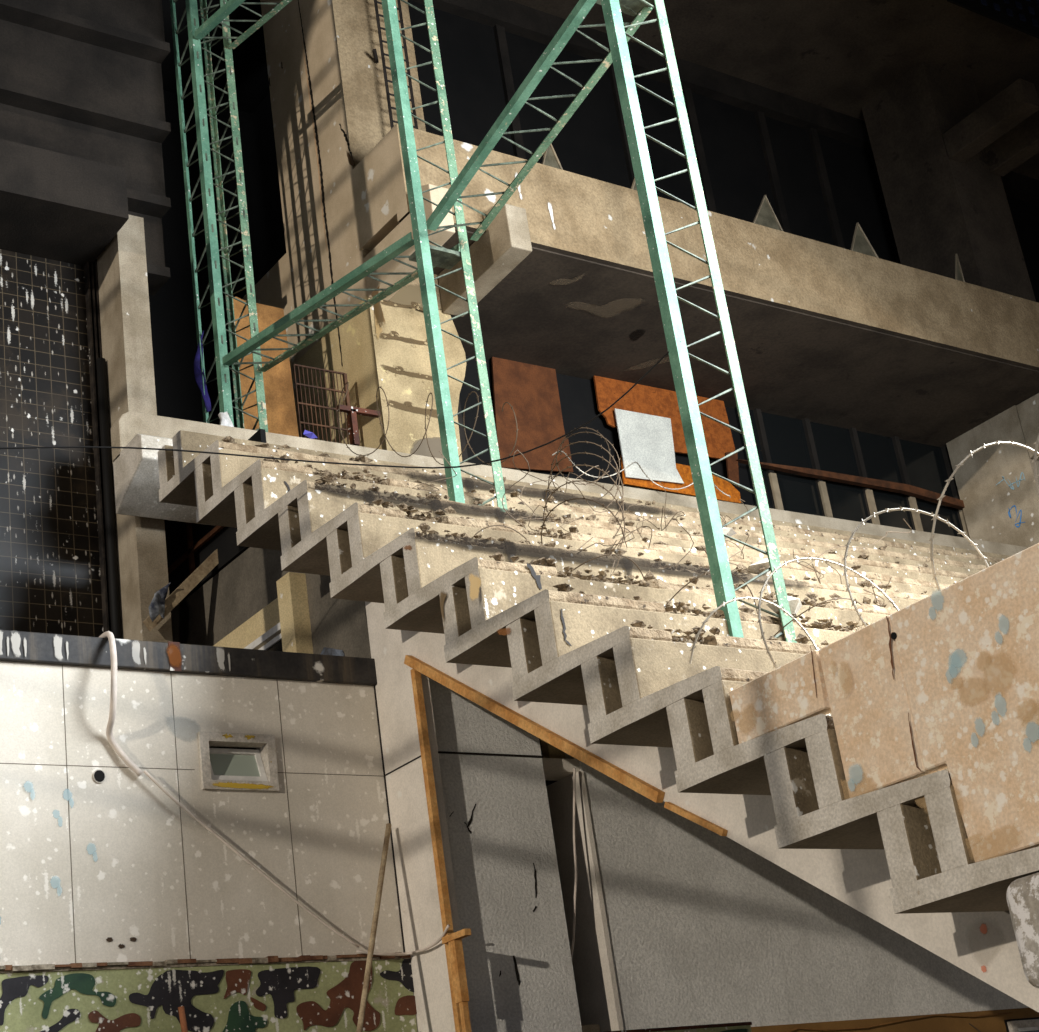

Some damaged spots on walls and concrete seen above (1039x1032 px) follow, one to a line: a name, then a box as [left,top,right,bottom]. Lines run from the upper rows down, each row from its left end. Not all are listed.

crack [886,616,894,680]
crack [908,713,921,771]
crack [449,804,476,834]
crack [531,863,539,912]